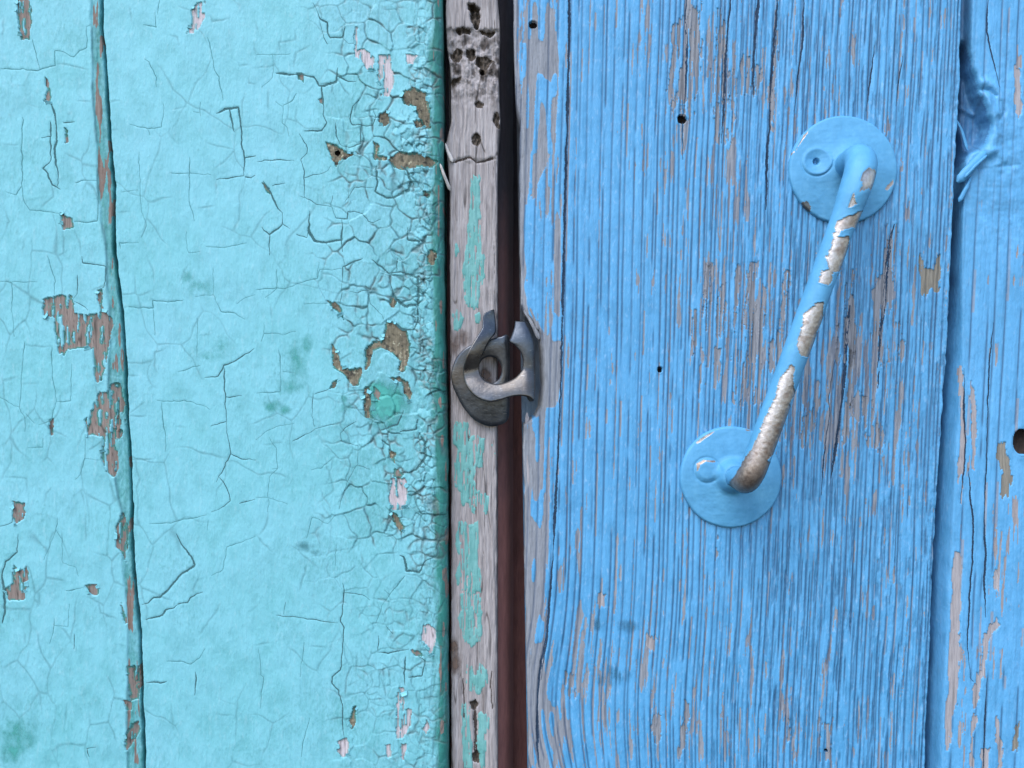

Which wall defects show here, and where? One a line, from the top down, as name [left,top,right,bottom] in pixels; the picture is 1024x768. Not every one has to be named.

crack [313,3,355,43]
peeling [666,1,779,145]
crack [0,104,147,448]
peeling [43,289,126,477]
crack [129,37,433,620]
peeling [328,298,412,419]
peeling [691,261,791,407]
crack [1,515,18,623]
crack [278,544,439,734]
peeling [453,421,496,647]
peeling [945,552,963,751]
crack [960,332,993,768]